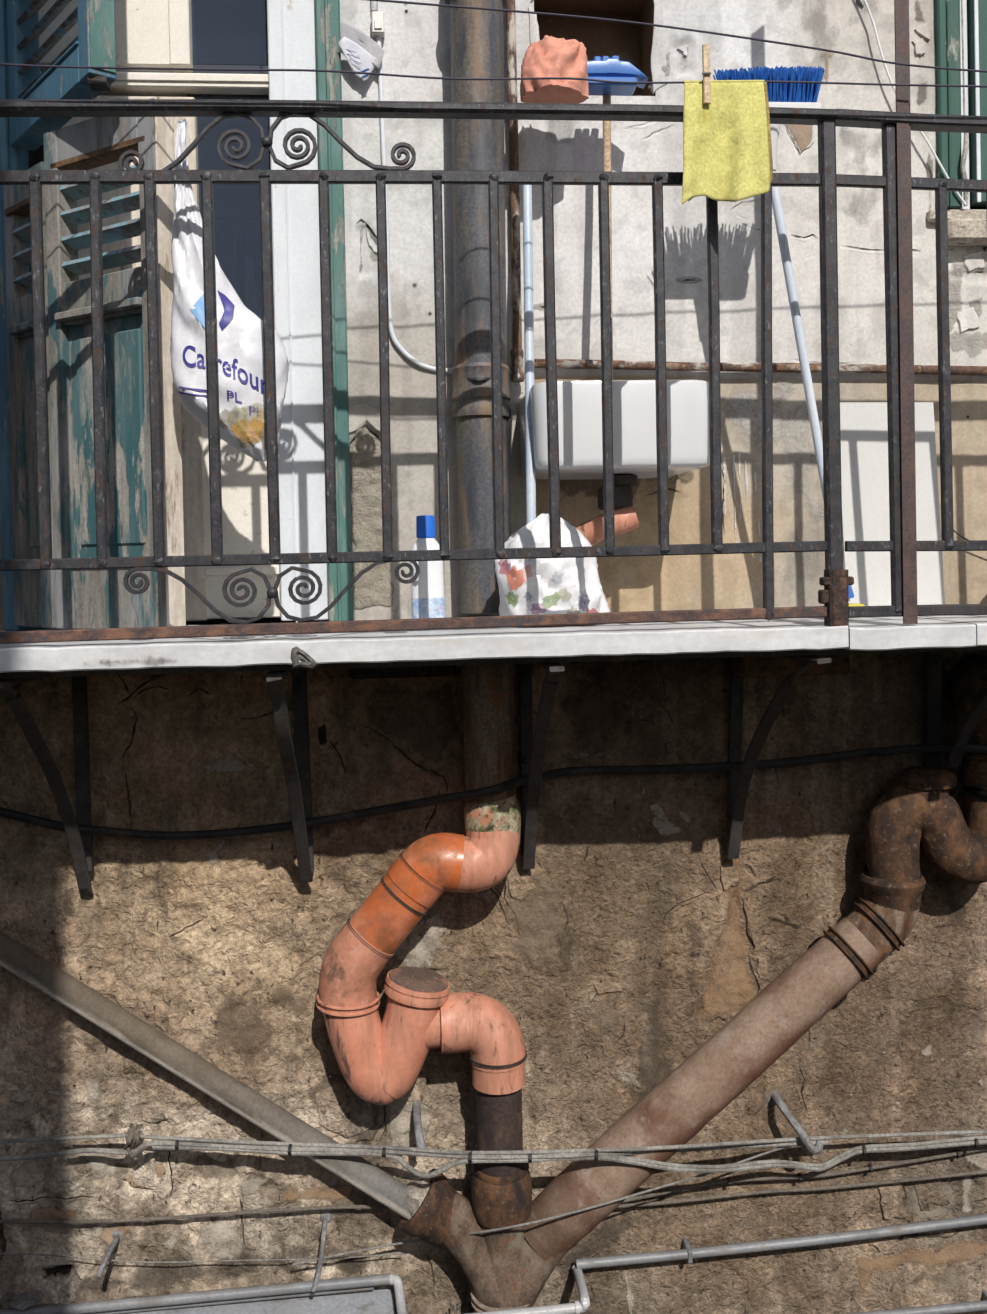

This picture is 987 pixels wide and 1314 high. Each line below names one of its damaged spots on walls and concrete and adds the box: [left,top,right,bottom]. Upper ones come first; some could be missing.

peeling [948,247,987,355]
crack [113,674,162,826]
crack [164,1133,173,1197]
crack [0,1195,96,1261]
crack [237,1196,245,1247]